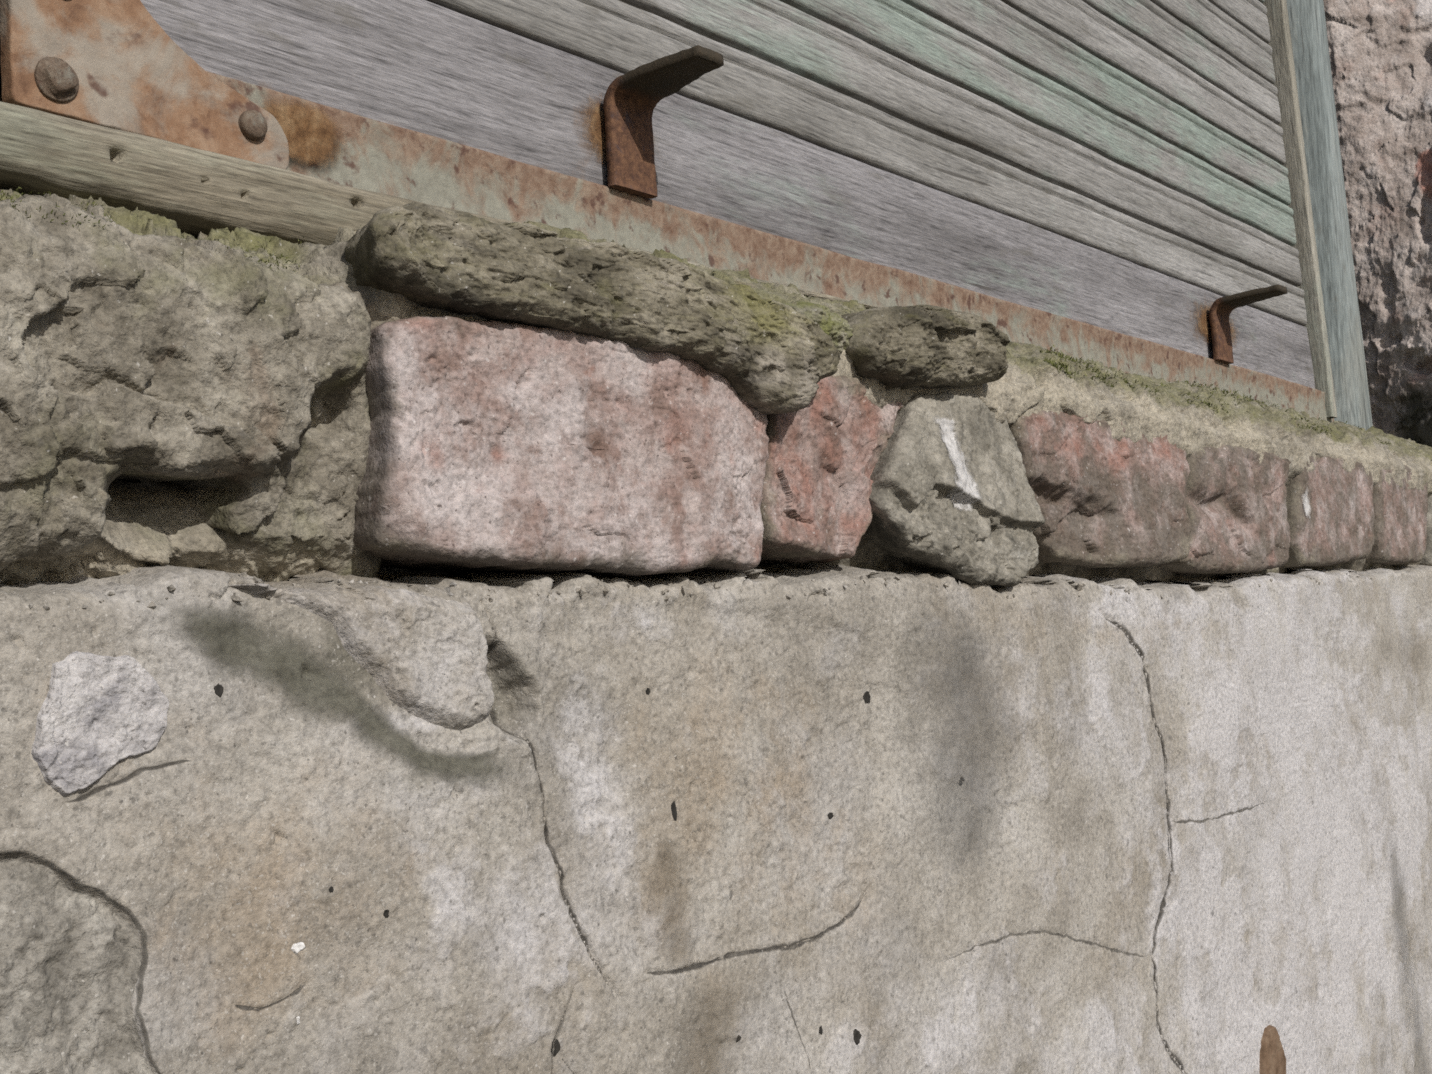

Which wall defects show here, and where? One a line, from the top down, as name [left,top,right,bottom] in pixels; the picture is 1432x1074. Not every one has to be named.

corrosion [587,100,607,162]
corrosion [1198,306,1212,345]
crack [487,620,497,653]
crack [954,618,1264,1074]
crack [490,708,606,1074]
spalling [0,852,161,1074]
crack [648,896,864,975]
crack [785,993,811,1069]